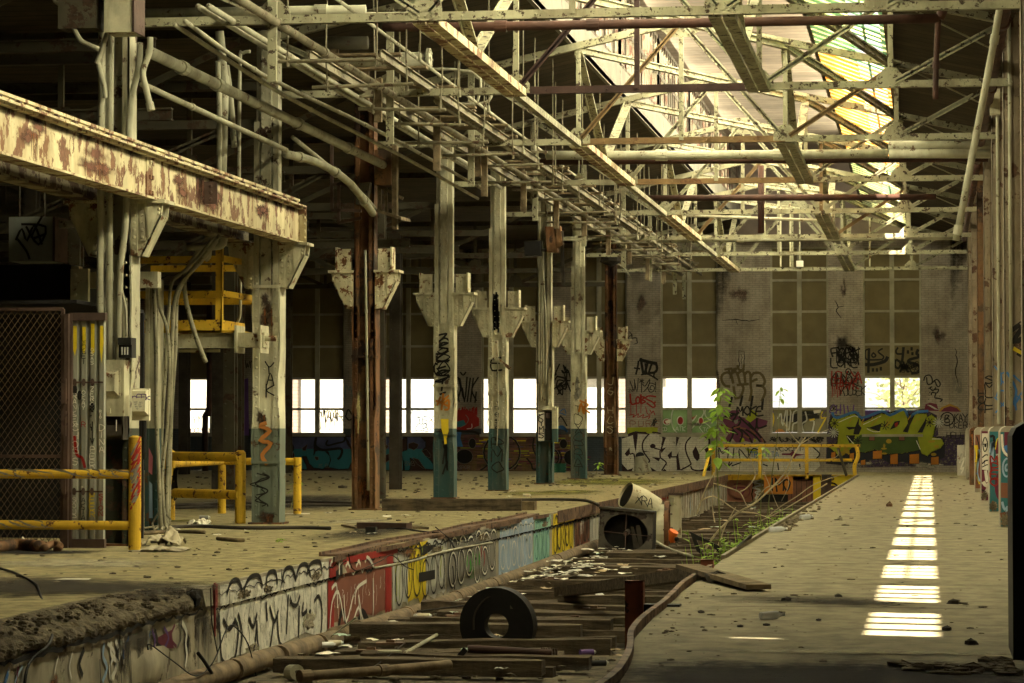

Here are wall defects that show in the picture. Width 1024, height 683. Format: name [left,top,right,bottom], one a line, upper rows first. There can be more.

rust [196,177,204,201]